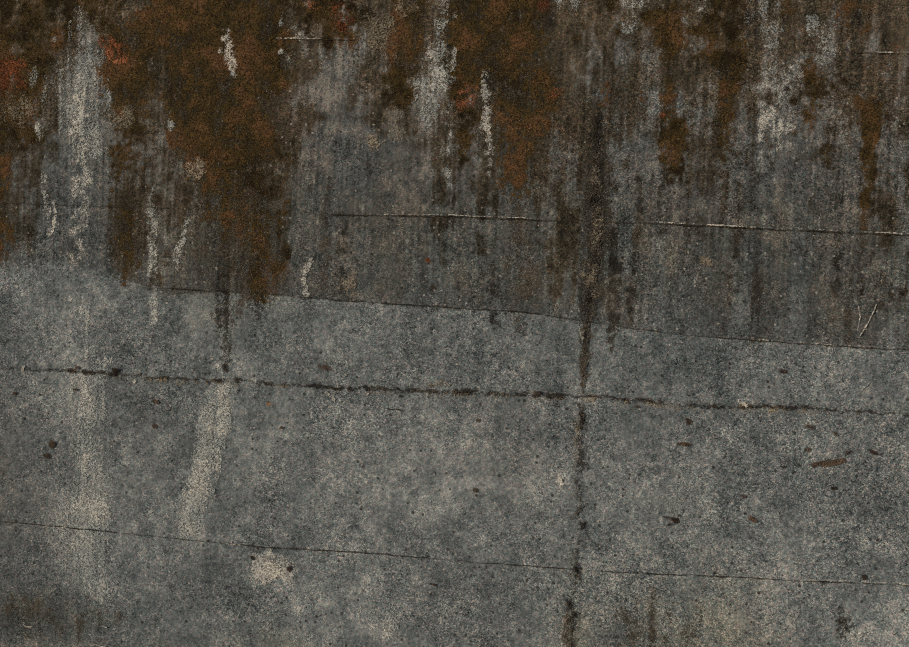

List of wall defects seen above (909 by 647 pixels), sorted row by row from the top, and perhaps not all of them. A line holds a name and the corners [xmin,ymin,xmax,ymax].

efflorescence [59,17,111,261]
rust [0,0,370,305]
efflorescence [218,30,236,76]
efflorescence [413,10,457,131]
rust [381,0,565,204]
efflorescence [481,74,492,176]
efflorescence [757,66,793,164]
efflorescence [806,14,836,55]
leakage [147,197,158,277]
leakage [301,176,349,297]
leakage [577,96,644,377]
leakage [562,599,580,647]